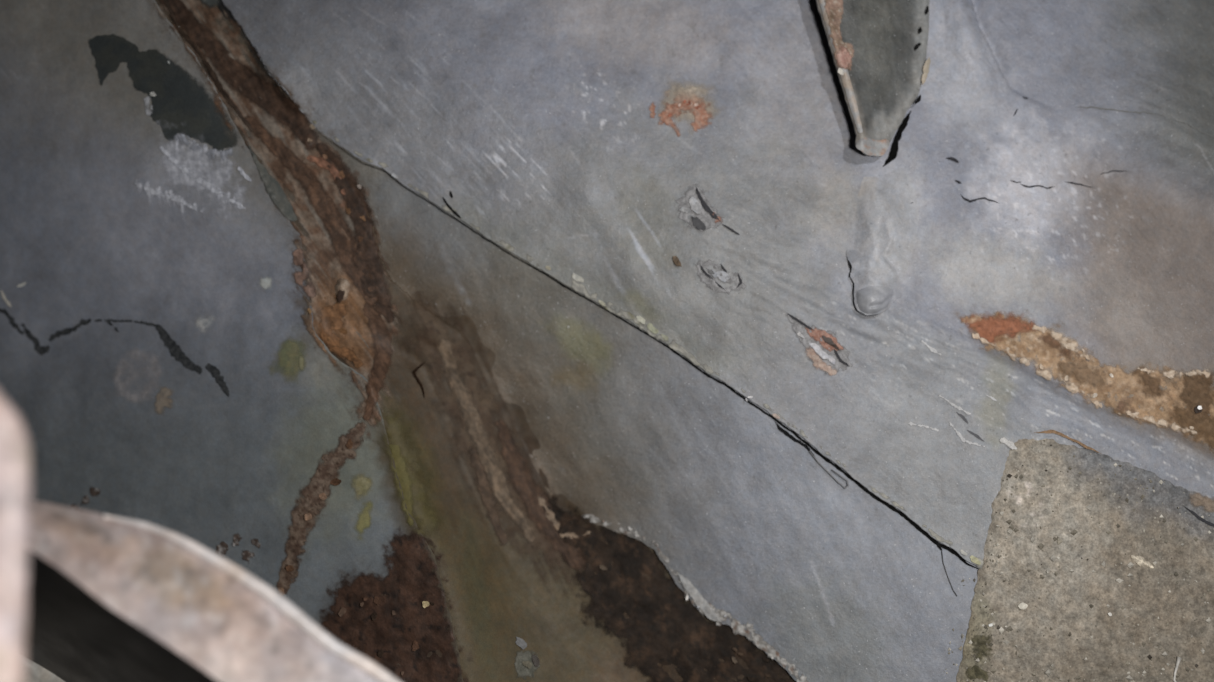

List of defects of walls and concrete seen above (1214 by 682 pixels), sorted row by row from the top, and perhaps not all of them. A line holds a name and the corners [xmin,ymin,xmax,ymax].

corrosion [825,0,854,76]
peeling [89,34,297,221]
spalling [676,184,740,235]
crack [947,157,1122,203]
crack [0,308,229,397]
corrosion [155,0,795,682]
crack [316,131,979,569]
spalling [787,314,853,374]
crack [956,412,985,442]
crack [1184,506,1214,526]
peeling [582,514,809,682]
spalling [514,637,540,679]